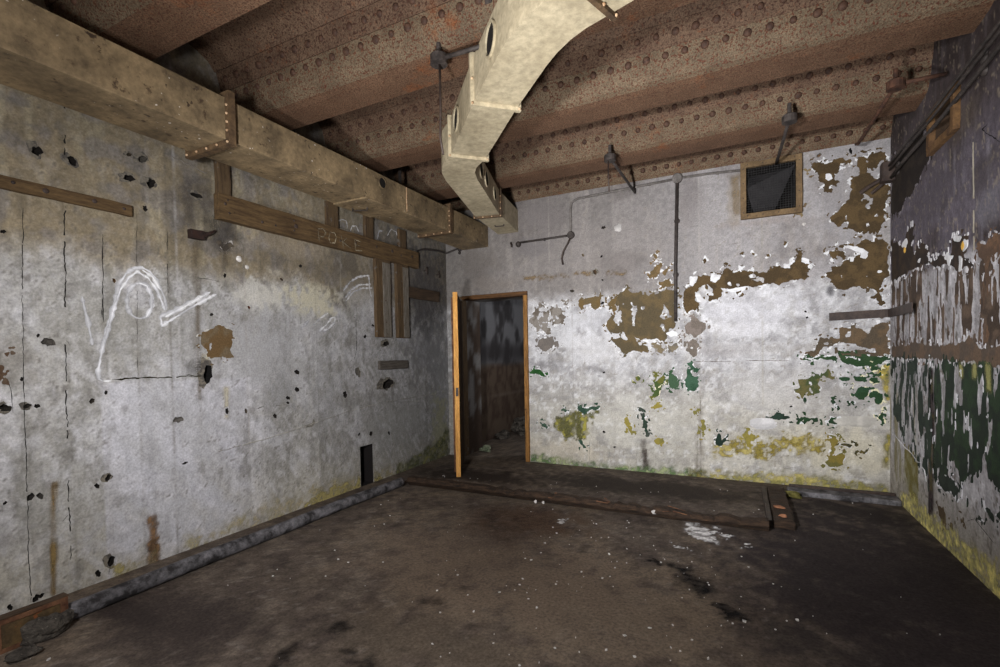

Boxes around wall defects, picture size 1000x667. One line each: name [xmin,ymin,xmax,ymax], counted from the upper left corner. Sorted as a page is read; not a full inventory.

flaking render [196,313,236,389]
peeling [528,241,816,451]
peeling [765,129,1000,532]
rust [147,516,160,564]